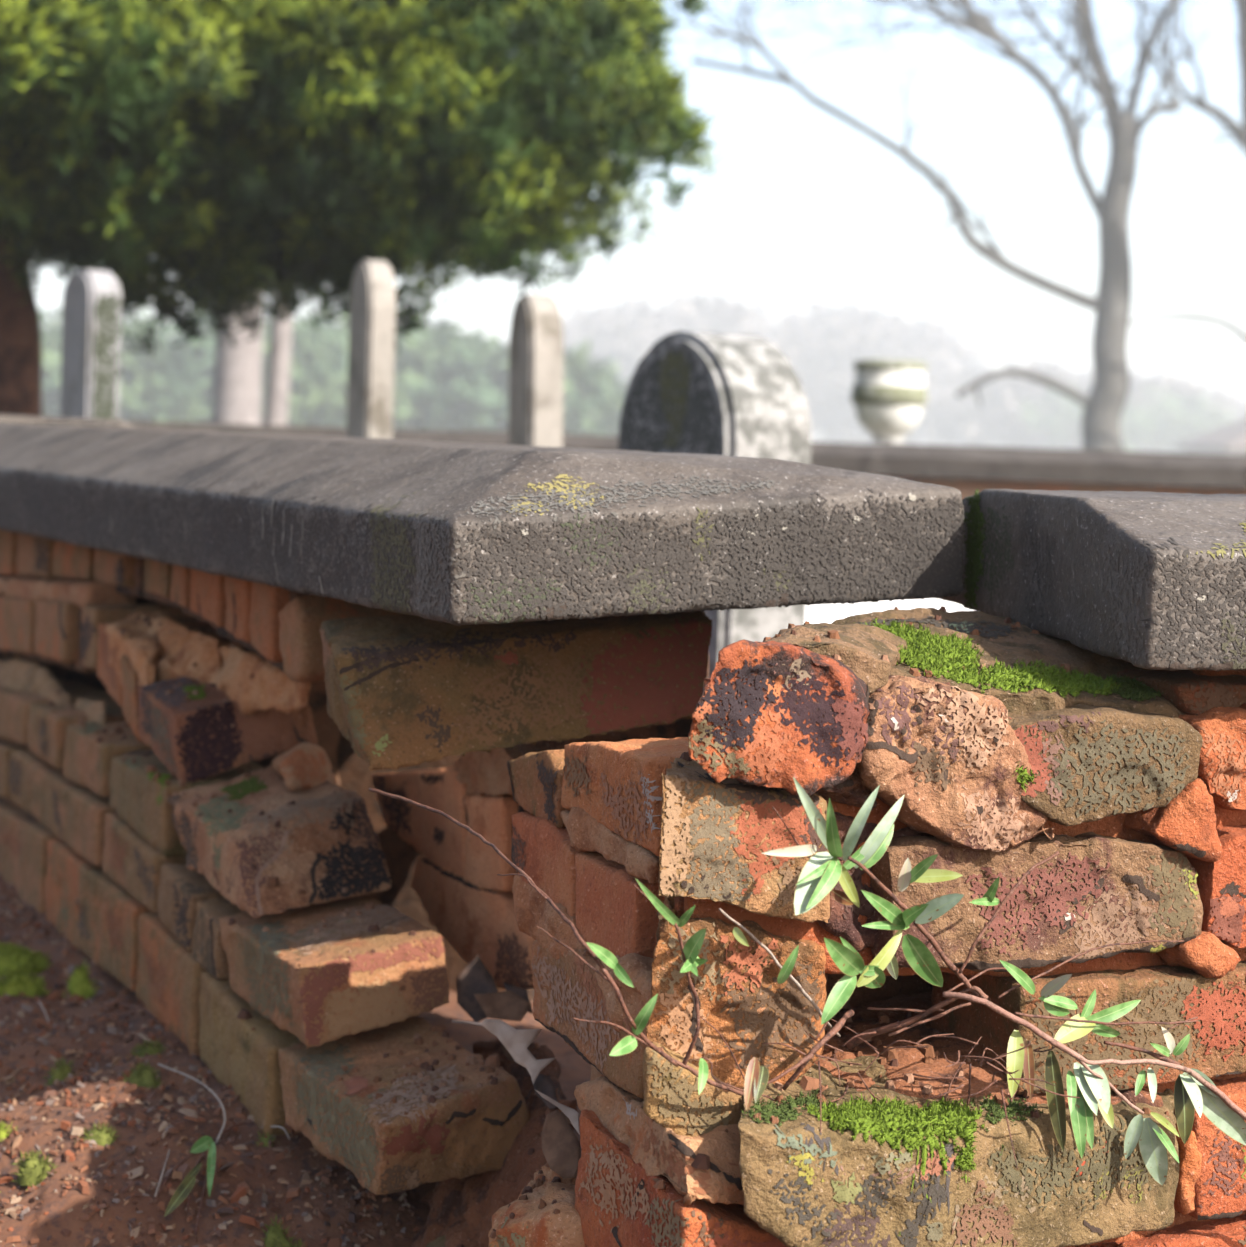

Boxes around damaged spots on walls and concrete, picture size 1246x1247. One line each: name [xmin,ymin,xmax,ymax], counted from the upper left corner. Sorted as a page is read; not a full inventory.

spalling [723,675,805,782]
spalling [227,826,286,917]
crack [421,760,518,894]
spalling [730,792,822,901]
crack [445,1100,522,1126]